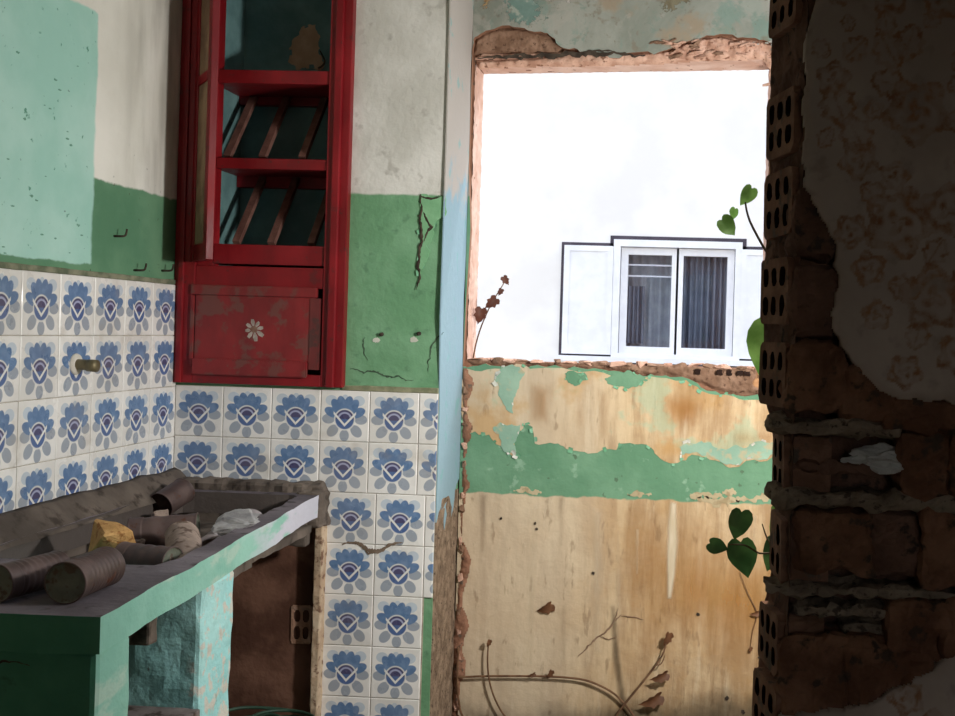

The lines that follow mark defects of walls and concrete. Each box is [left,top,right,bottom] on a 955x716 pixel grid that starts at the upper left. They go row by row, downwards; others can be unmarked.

flaking render [452,0,955,716]
water stain [668,503,677,597]
water stain [607,690,752,716]